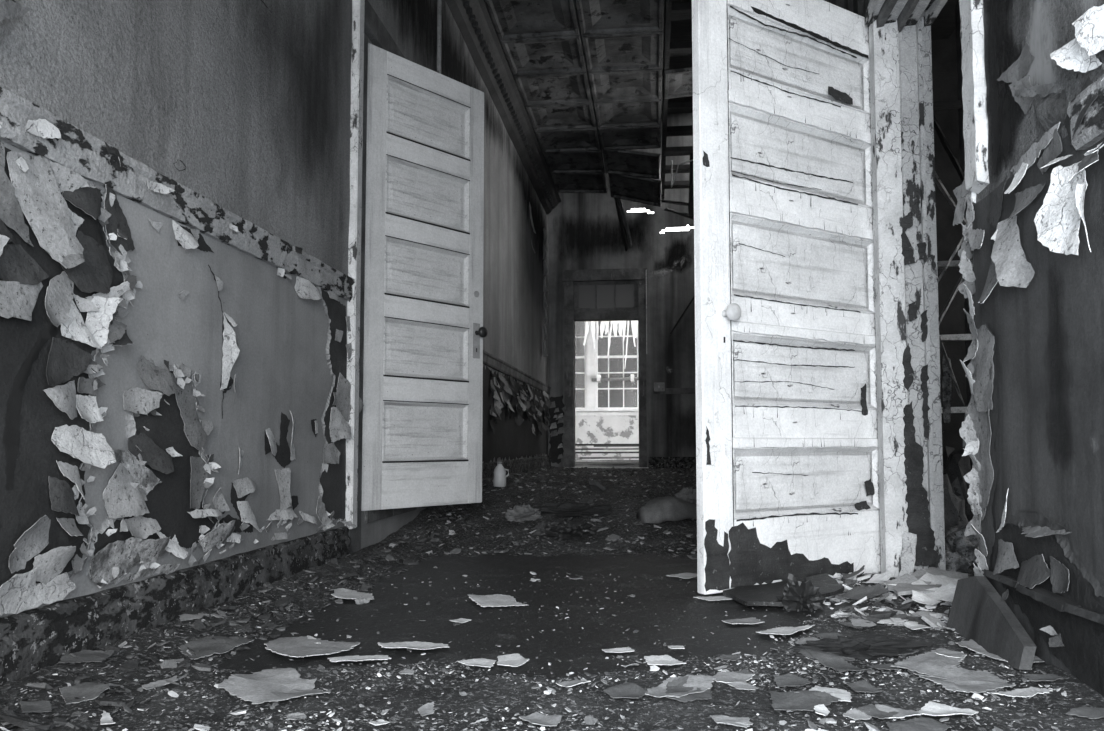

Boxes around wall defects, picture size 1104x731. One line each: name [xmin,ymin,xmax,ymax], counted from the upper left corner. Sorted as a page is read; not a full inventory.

peeling [25,119,62,141]
peeling [900,211,927,265]
peeling [0,142,364,617]
peeling [482,365,565,464]
peeling [908,301,928,342]
flaking render [953,4,1104,697]
peeling [873,343,937,601]
peeling [695,519,854,601]
peeling [58,650,114,663]